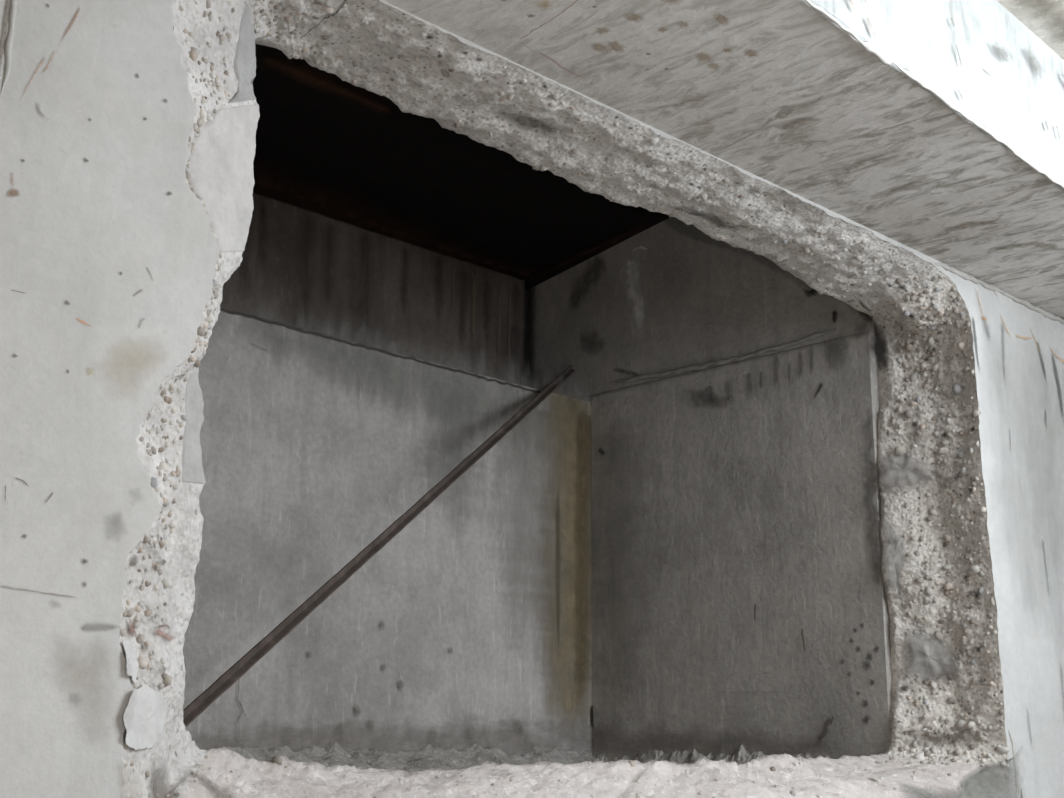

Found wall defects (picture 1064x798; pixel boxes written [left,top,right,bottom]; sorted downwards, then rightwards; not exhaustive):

crack [0,0,17,94]
water stain [214,723,552,753]
water stain [311,280,847,754]
spalling [171,0,1020,798]